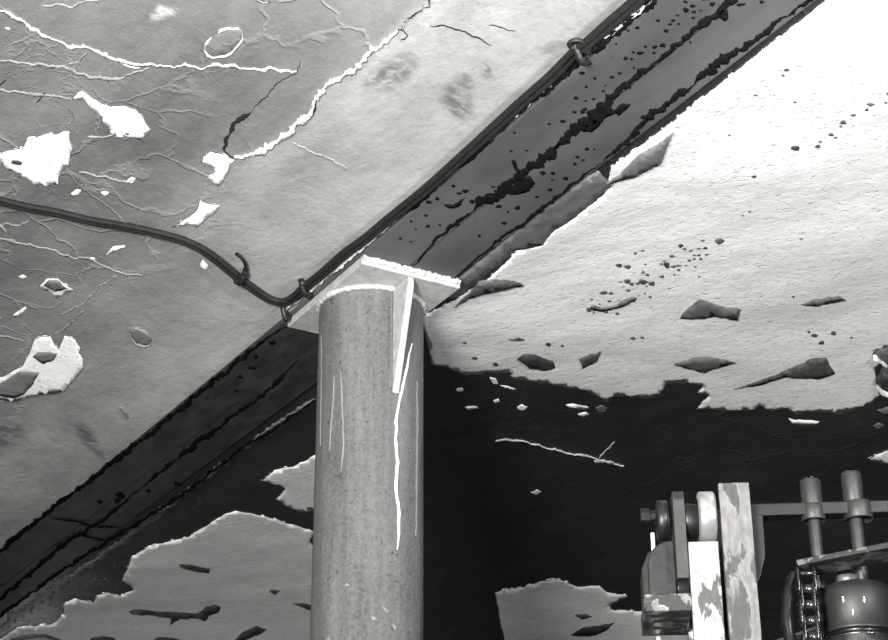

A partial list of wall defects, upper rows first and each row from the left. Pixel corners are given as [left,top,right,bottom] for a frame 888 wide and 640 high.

crack [43,0,98,9]
peeling [72,90,151,142]
crack [0,10,297,125]
crack [222,0,513,170]
peeling [0,130,73,188]
crack [79,171,135,184]
spalling [423,0,888,430]
crack [0,220,143,334]
peeling [0,334,84,403]
crack [496,438,624,467]
spalling [0,398,316,640]
spalling [494,578,688,640]